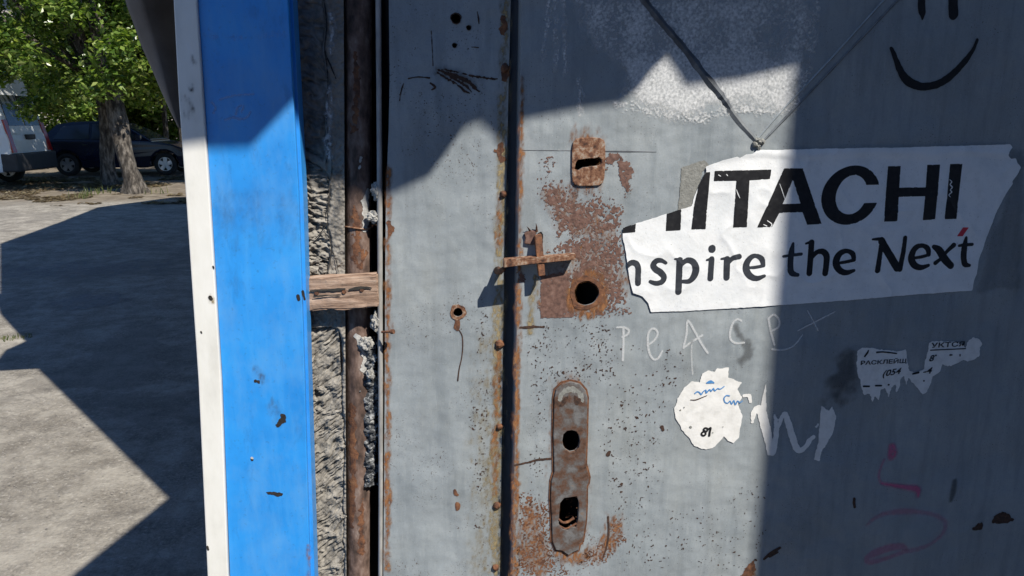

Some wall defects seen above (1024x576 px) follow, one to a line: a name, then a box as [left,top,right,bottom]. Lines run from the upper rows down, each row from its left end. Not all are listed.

rust [347,402,366,556]
rust [384,281,392,571]
rust [385,167,395,265]
rust [480,87,627,576]